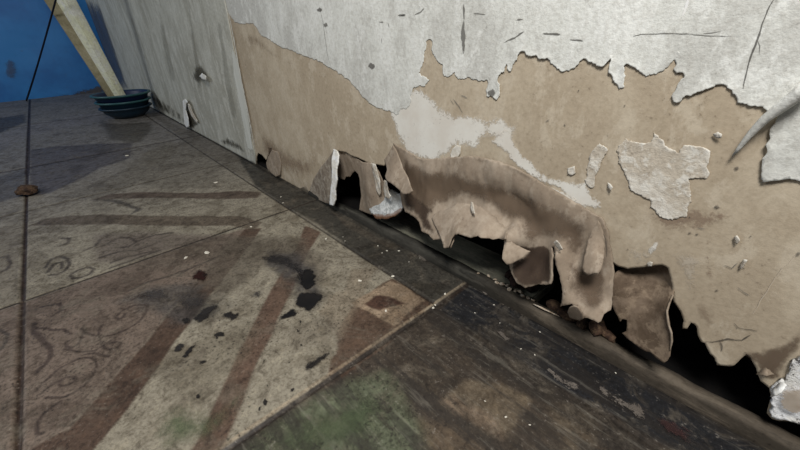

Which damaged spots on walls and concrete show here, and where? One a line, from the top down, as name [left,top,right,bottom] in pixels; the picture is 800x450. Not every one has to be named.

peeling [225,0,800,220]
spalling [769,355,800,424]